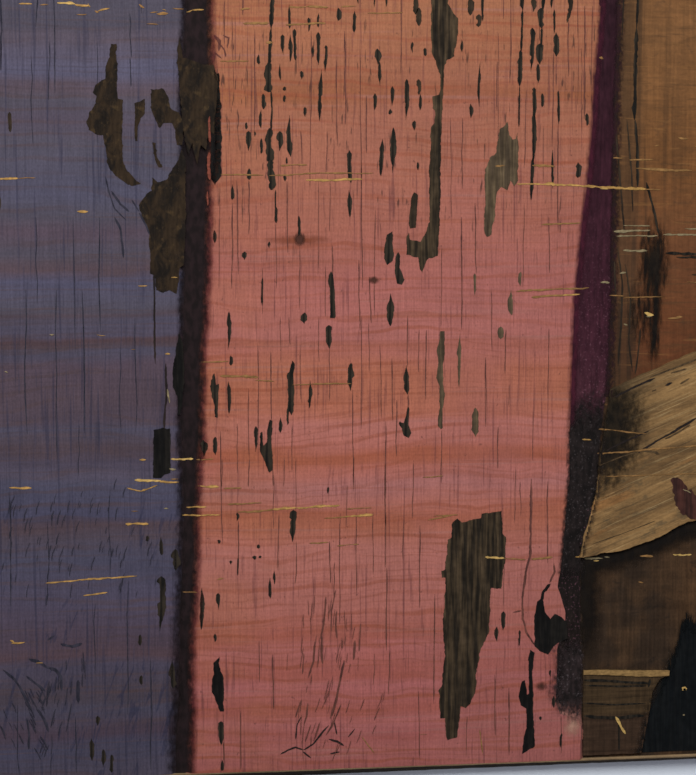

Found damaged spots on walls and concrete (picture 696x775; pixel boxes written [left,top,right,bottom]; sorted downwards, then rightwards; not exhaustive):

peeling [468,0,484,27]
peeling [86,44,141,186]
peeling [134,38,222,294]
peeling [379,128,397,175]
peeling [384,0,463,285]
peeling [484,122,519,237]
peeling [530,28,544,199]
peeling [153,428,171,478]
peeling [254,361,295,472]
peeling [212,657,224,711]
peeling [438,511,506,740]
peeling [519,584,568,754]